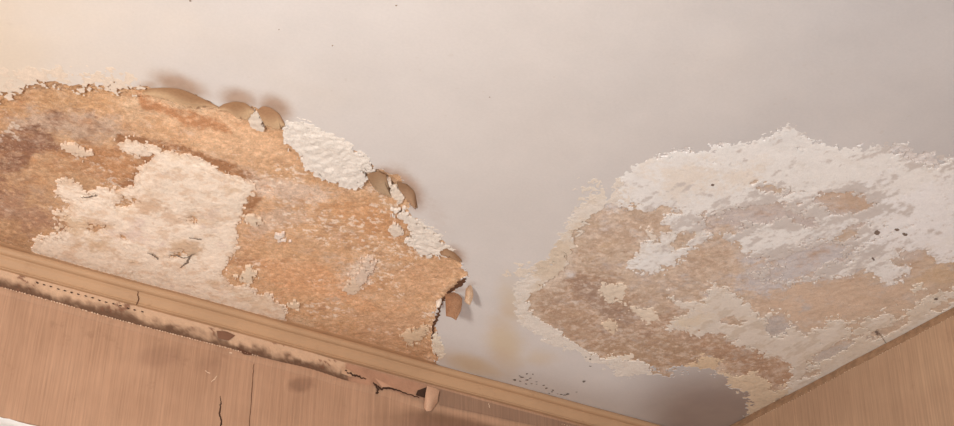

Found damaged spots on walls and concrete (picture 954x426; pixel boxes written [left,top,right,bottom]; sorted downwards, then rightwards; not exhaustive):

leakage [107,331,270,403]
leakage [122,55,312,127]
flaking render [0,60,473,363]
peeling [502,122,954,417]